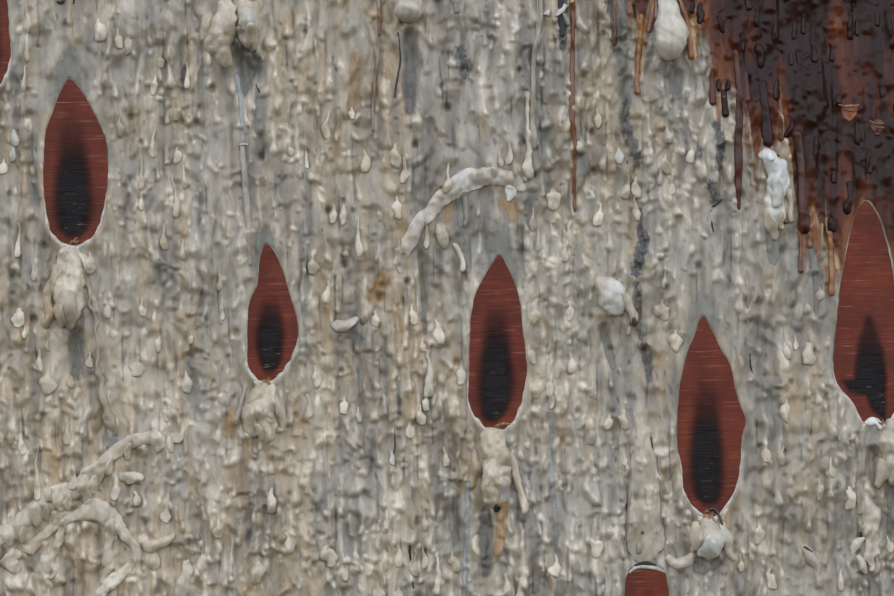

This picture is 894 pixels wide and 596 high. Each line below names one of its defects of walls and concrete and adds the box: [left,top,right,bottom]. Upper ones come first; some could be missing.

spalling [0,0,12,85]
spalling [43,47,108,248]
corrosion [569,0,577,213]
corrosion [634,0,648,95]
spalling [245,227,298,385]
spalling [467,226,527,430]
spalling [677,293,746,525]
corrosion [798,203,843,297]
spalling [833,201,894,427]
spalling [625,561,669,596]